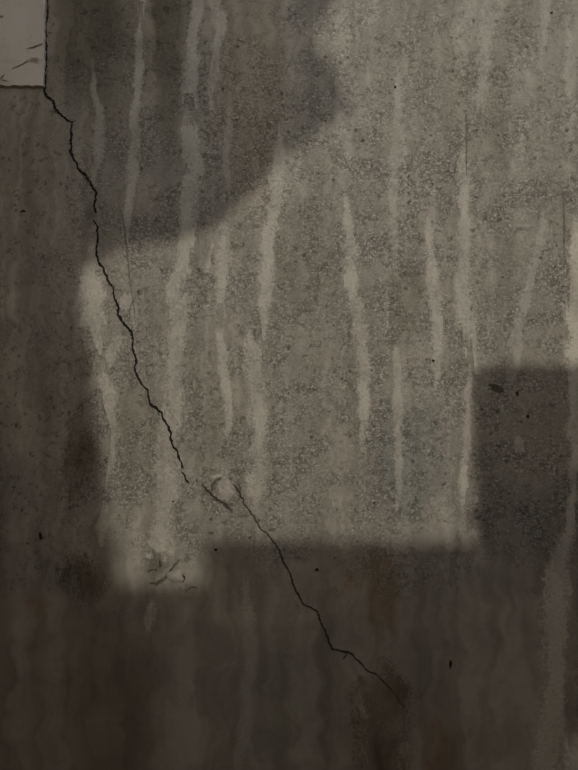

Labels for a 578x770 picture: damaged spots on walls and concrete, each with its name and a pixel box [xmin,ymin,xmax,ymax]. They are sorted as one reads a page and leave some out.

damp [39,0,149,621]
damp [138,0,293,770]
crack [43,0,405,708]
efflorescence [338,172,410,520]
damp [329,638,437,770]
damp [384,45,406,311]
damp [420,0,502,545]
damp [501,188,552,457]
damp [516,197,578,770]
efflorescence [532,0,578,141]